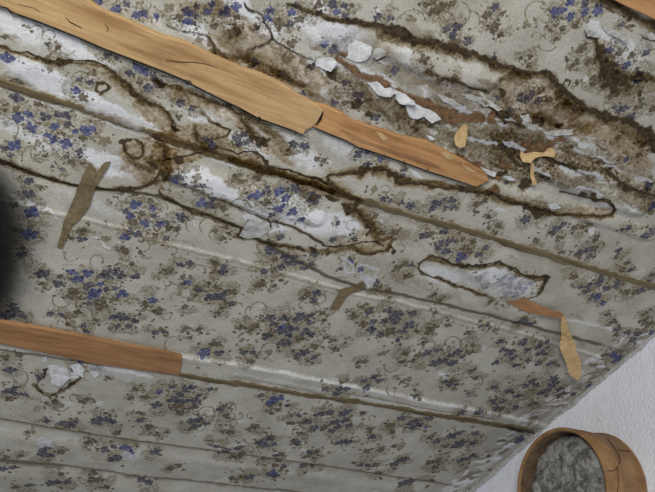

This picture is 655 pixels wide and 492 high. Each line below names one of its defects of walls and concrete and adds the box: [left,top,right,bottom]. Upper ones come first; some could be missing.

water stain [0,45,181,132]
crack [167,25,216,54]
water stain [212,50,304,87]
peeling [315,57,337,72]
peeling [346,39,387,62]
peeling [368,81,441,123]
water stain [286,0,655,153]
water stain [0,159,78,187]
water stain [95,78,617,255]
peeling [481,167,515,181]
crack [190,188,325,245]
peeling [42,356,100,386]